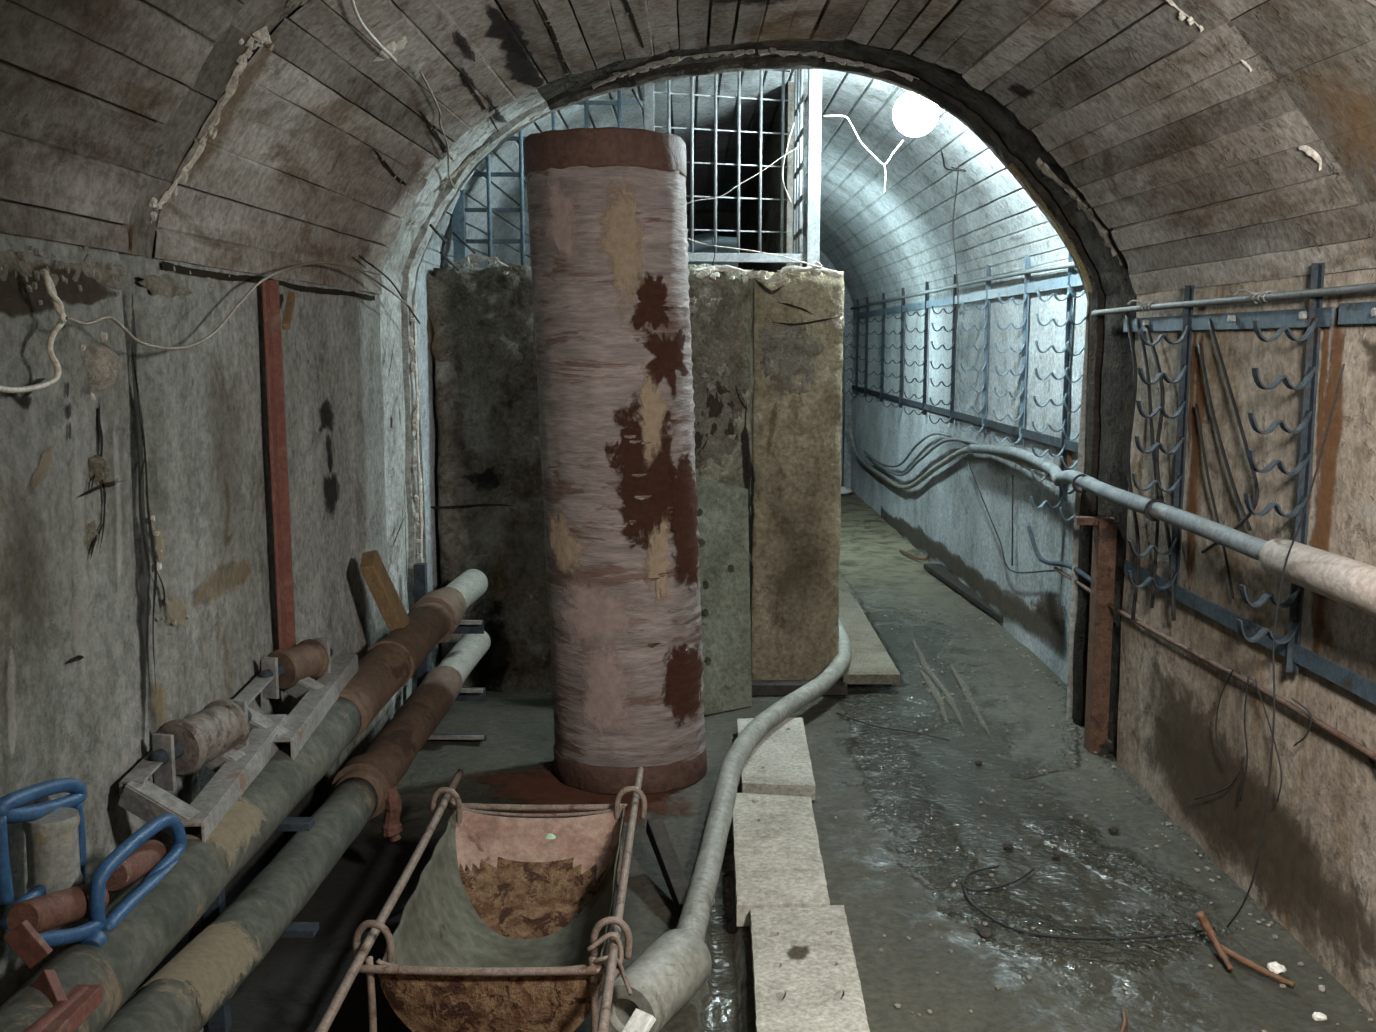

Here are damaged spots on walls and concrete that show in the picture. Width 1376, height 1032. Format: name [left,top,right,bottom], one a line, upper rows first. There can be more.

spalling [0,246,193,305]
corrosion [605,273,700,595]